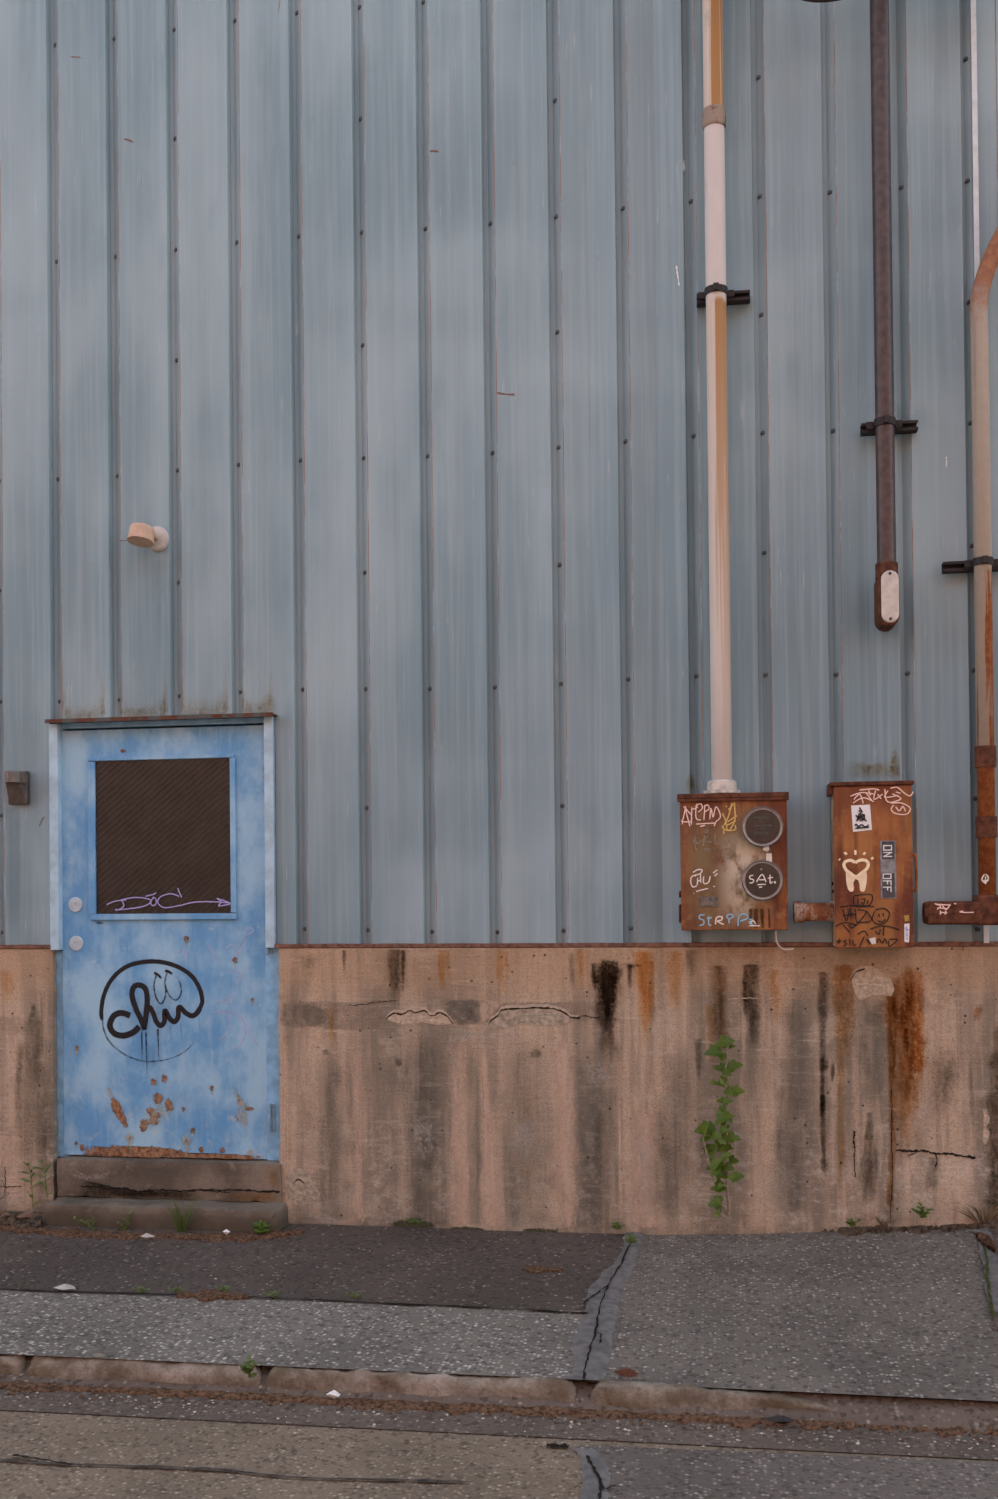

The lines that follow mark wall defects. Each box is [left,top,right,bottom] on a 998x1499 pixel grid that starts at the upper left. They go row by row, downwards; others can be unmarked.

spalling [386,1007,453,1025]
spalling [488,1004,580,1029]
water stain [592,962,632,1044]
corrosion [74,1074,261,1160]
crack [853,1089,976,1223]